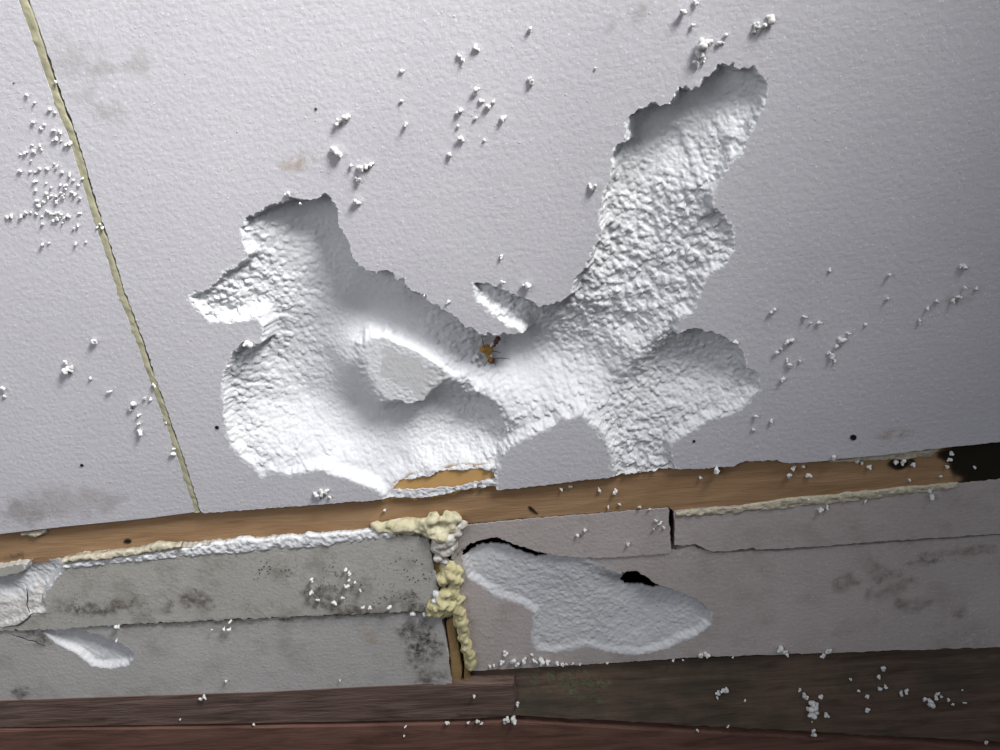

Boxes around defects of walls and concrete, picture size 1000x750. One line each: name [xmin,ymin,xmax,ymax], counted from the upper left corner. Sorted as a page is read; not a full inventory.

spalling [186,61,769,502]
spalling [0,558,65,627]